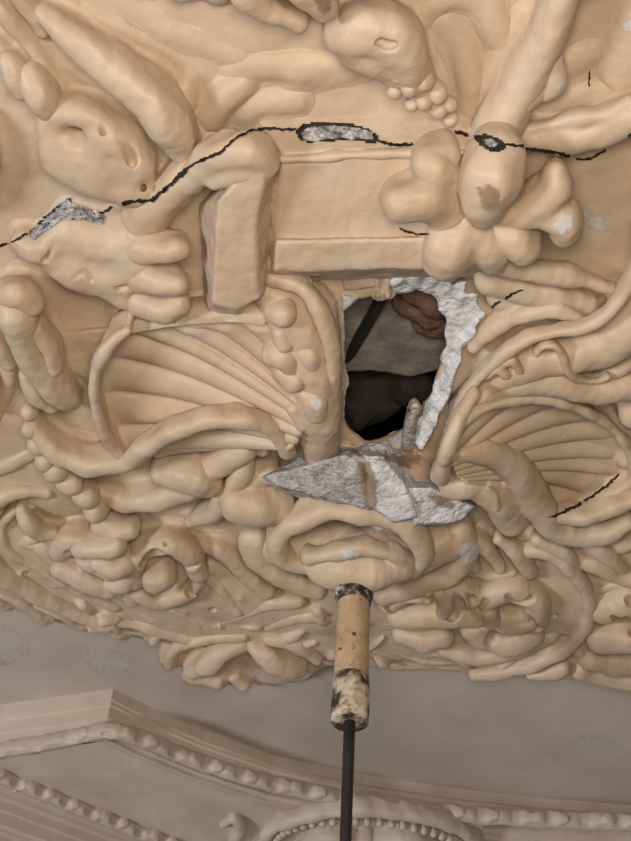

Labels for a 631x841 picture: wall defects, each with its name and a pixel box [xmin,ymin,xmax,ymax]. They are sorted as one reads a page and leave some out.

spalling [296,122,378,143]
crack [376,139,414,147]
crack [455,129,469,137]
crack [503,143,606,161]
crack [80,126,297,215]
spalling [29,198,105,239]
peeling [554,214,572,234]
crack [0,233,28,247]
spalling [341,293,358,311]
spalling [390,277,486,450]
spalling [262,430,475,532]
crack [549,473,619,518]